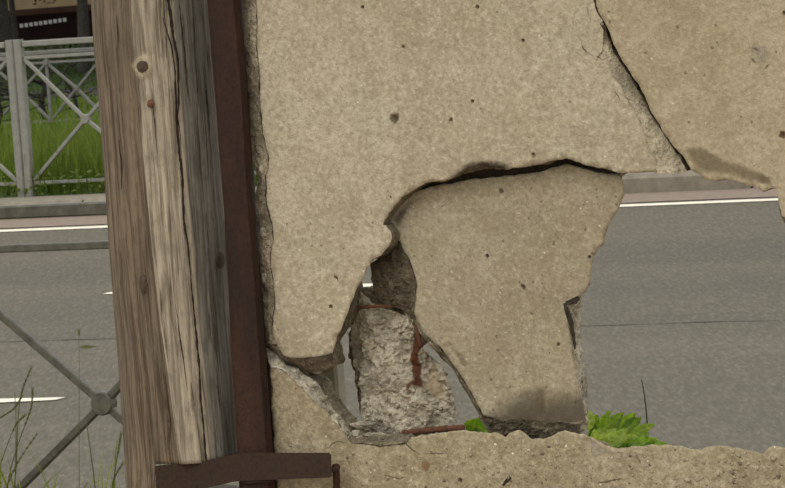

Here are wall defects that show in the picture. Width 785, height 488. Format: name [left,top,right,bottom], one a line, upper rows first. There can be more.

crack [582,0,660,125]
spalling [242,0,465,445]
crack [421,159,617,190]
rust [406,333,427,399]
spalling [357,241,569,439]